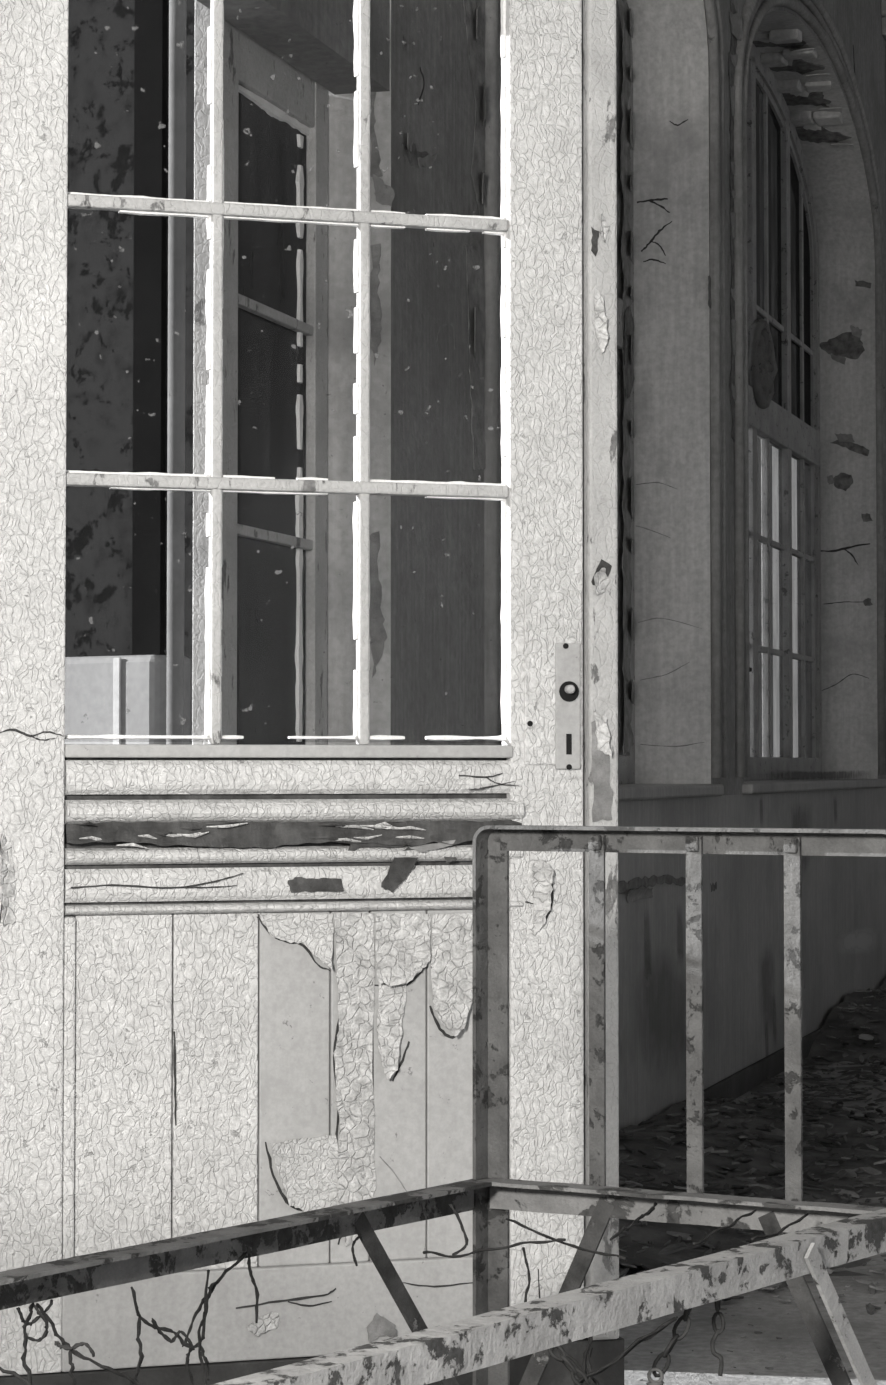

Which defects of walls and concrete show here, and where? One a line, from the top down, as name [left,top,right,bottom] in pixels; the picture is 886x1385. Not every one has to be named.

crack [637,198,672,264]
spalling [728,0,854,442]
spalling [820,325,865,365]
crack [0,729,63,741]
spalling [288,877,344,893]
crack [171,1031,179,1126]
peeling [257,913,472,1212]